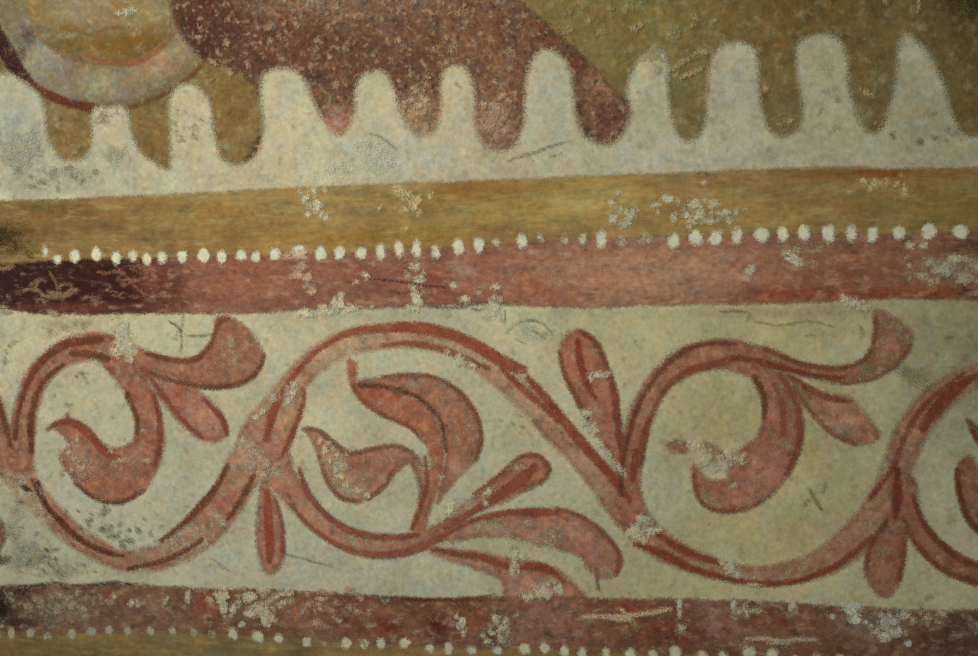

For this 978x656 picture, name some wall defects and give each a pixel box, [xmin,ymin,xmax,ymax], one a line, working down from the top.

peeling [606,179,748,231]
peeling [904,240,978,295]
peeling [480,613,519,645]